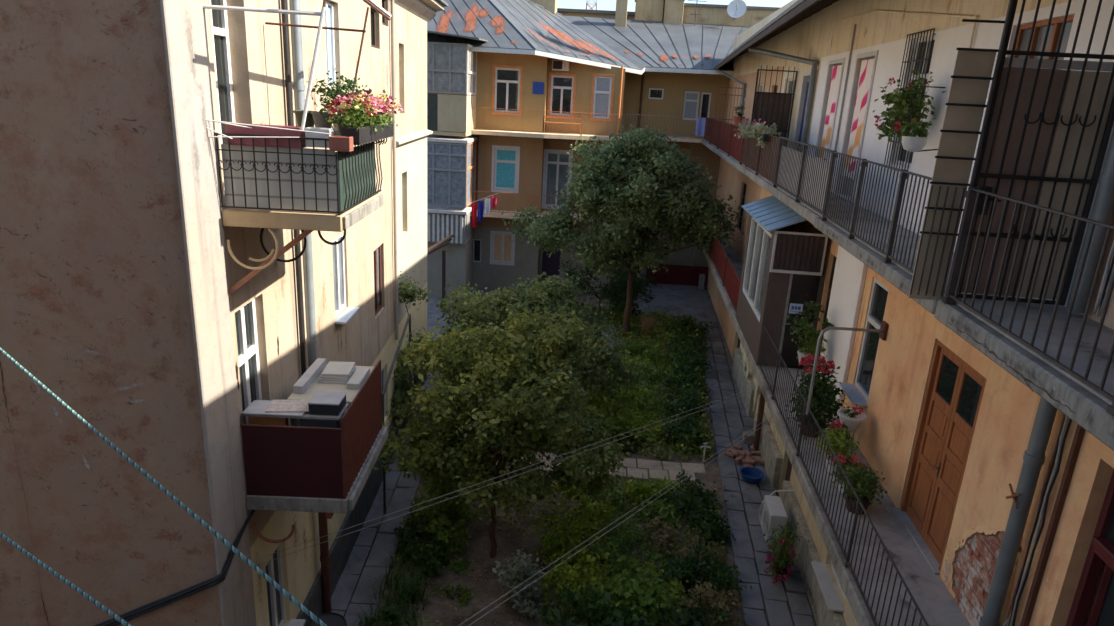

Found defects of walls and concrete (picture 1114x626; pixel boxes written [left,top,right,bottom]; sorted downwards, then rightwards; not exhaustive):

corrosion [437,11,452,37]
corrosion [460,4,505,43]
crack [0,362,9,422]
flaking render [946,524,1006,626]